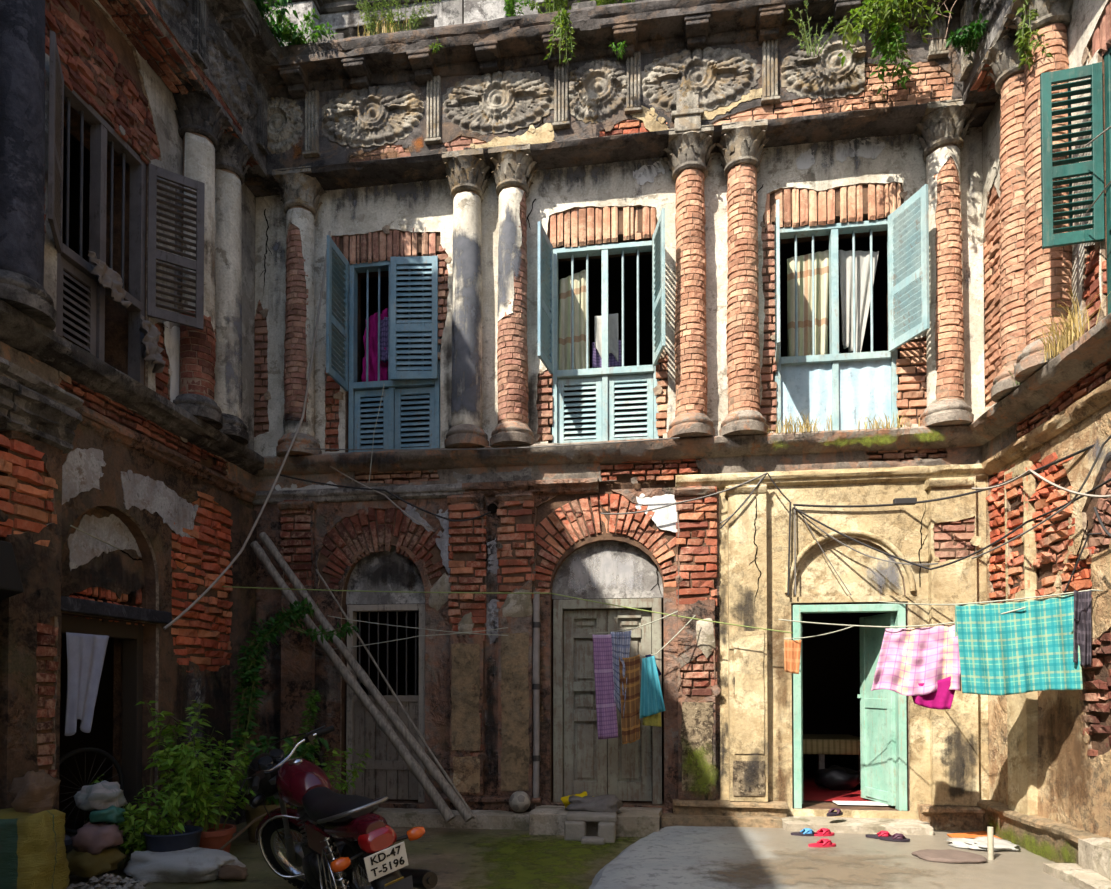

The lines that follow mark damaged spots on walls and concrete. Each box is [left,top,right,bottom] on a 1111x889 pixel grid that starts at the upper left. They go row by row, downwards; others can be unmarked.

spalling [701,58,954,125]
crack [260,209,272,292]
spalling [254,224,308,437]
damp [445,233,482,418]
spalling [497,187,553,442]
spalling [726,163,908,433]
spalling [896,158,965,427]
spalling [970,0,1111,407]
spalling [0,434,106,547]
spalling [67,470,233,673]
spalling [275,459,717,644]
spalling [933,452,1111,603]